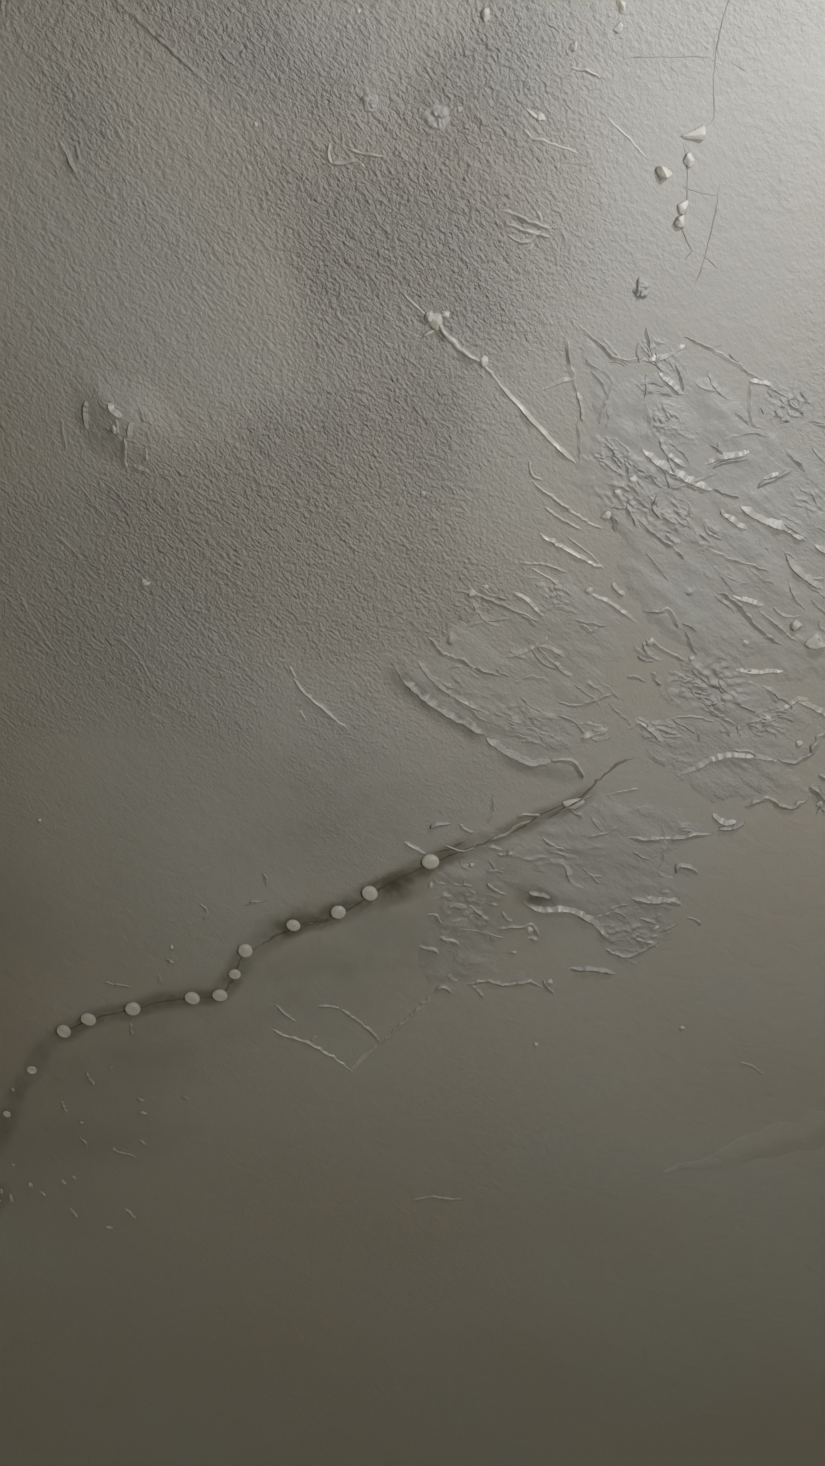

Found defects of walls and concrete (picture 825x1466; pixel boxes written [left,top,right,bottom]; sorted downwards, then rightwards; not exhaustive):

crack [70,758,634,1029]
peeling [270,324,825,1072]